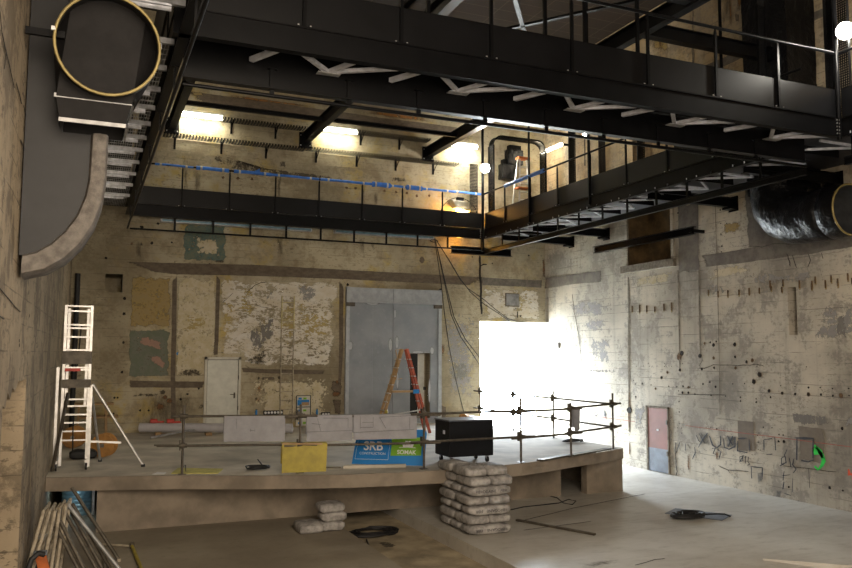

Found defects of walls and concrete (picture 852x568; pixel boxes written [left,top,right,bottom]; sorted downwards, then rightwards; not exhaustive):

peeling [129,277,337,377]
peeling [251,377,341,415]